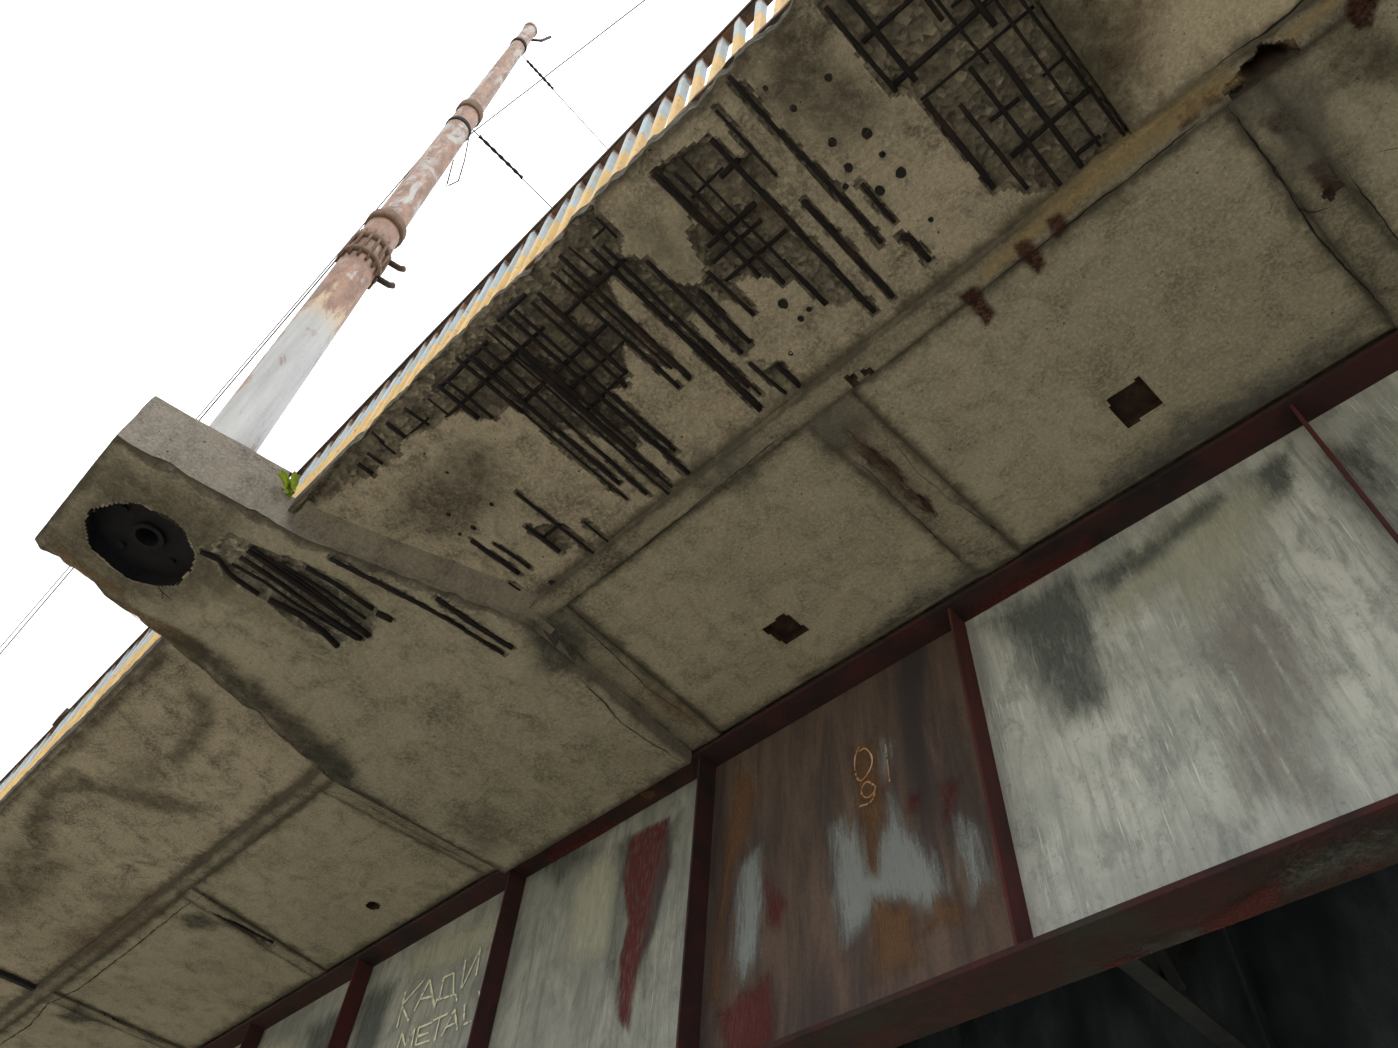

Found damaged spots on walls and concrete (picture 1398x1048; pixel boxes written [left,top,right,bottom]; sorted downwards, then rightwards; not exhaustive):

rust [1346,0,1378,29]
spalling [813,0,1128,197]
hole [1222,37,1301,101]
rust [1015,240,1045,273]
rust [1047,214,1068,238]
spalling [292,74,938,518]
rust [960,287,994,324]
spalling [512,488,610,556]
spalling [458,525,535,591]
spalling [197,532,518,658]